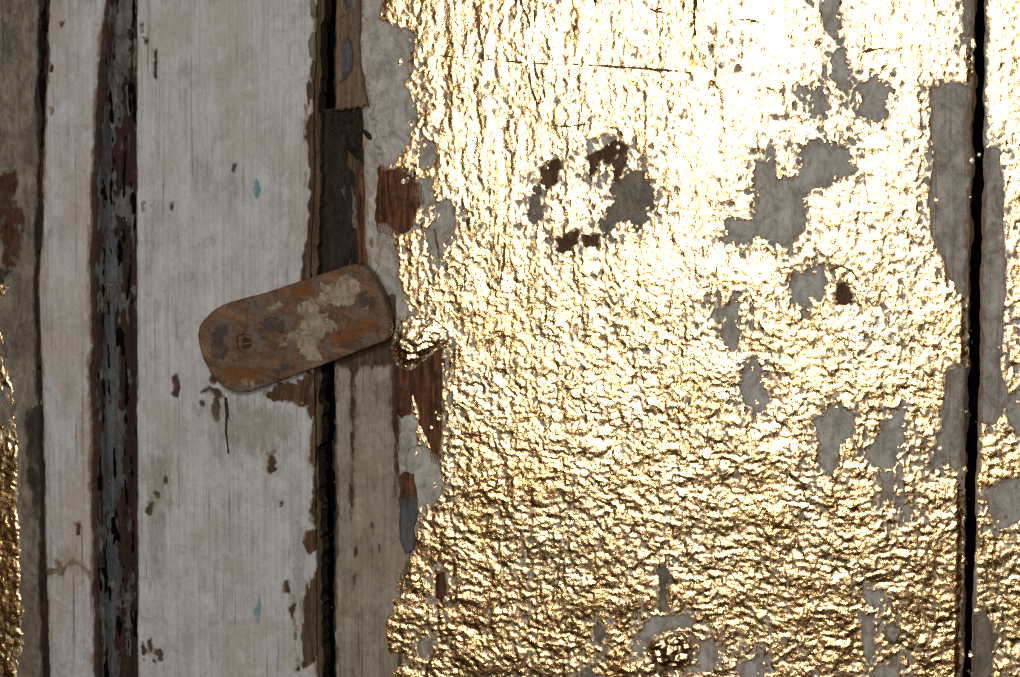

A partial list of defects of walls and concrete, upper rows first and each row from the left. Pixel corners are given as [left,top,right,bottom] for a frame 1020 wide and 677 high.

peeling [806,0,890,123]
peeling [361,0,456,321]
peeling [527,158,562,225]
peeling [556,139,656,253]
peeling [719,139,858,246]
peeling [928,82,1020,473]
peeling [813,403,856,475]